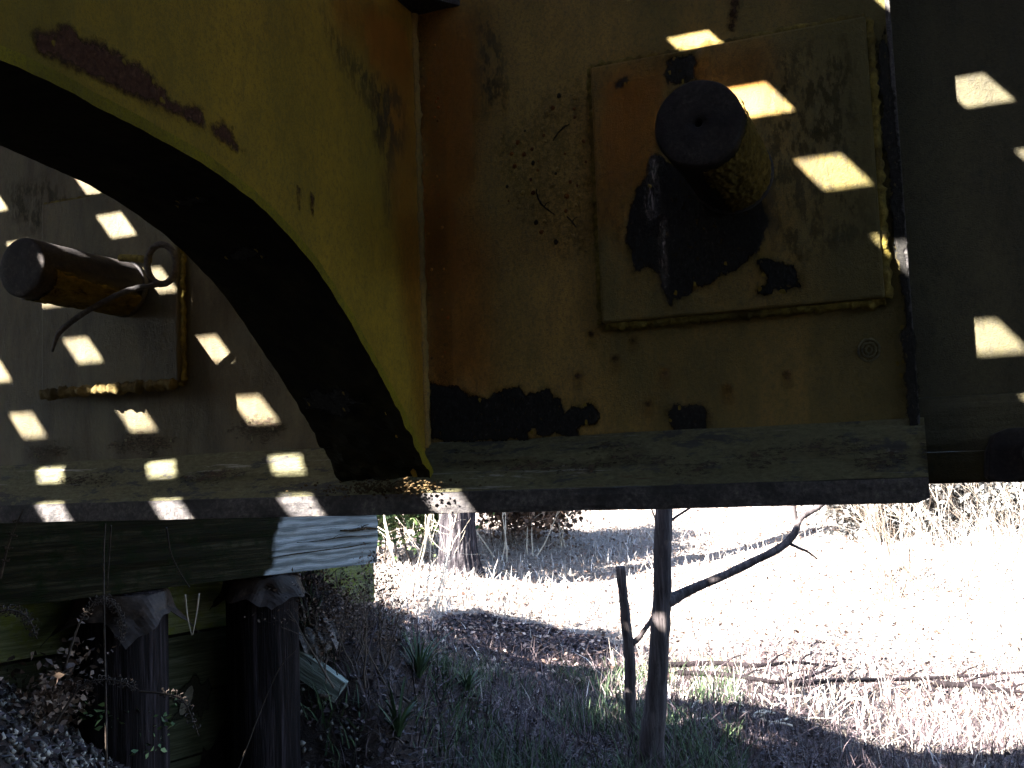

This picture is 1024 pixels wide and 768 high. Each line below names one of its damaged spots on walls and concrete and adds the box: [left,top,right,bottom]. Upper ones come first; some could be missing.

rust [32,24,239,152]
peeling [663,54,697,85]
peeling [625,101,801,307]
peeling [430,381,600,442]
peeling [668,403,707,430]